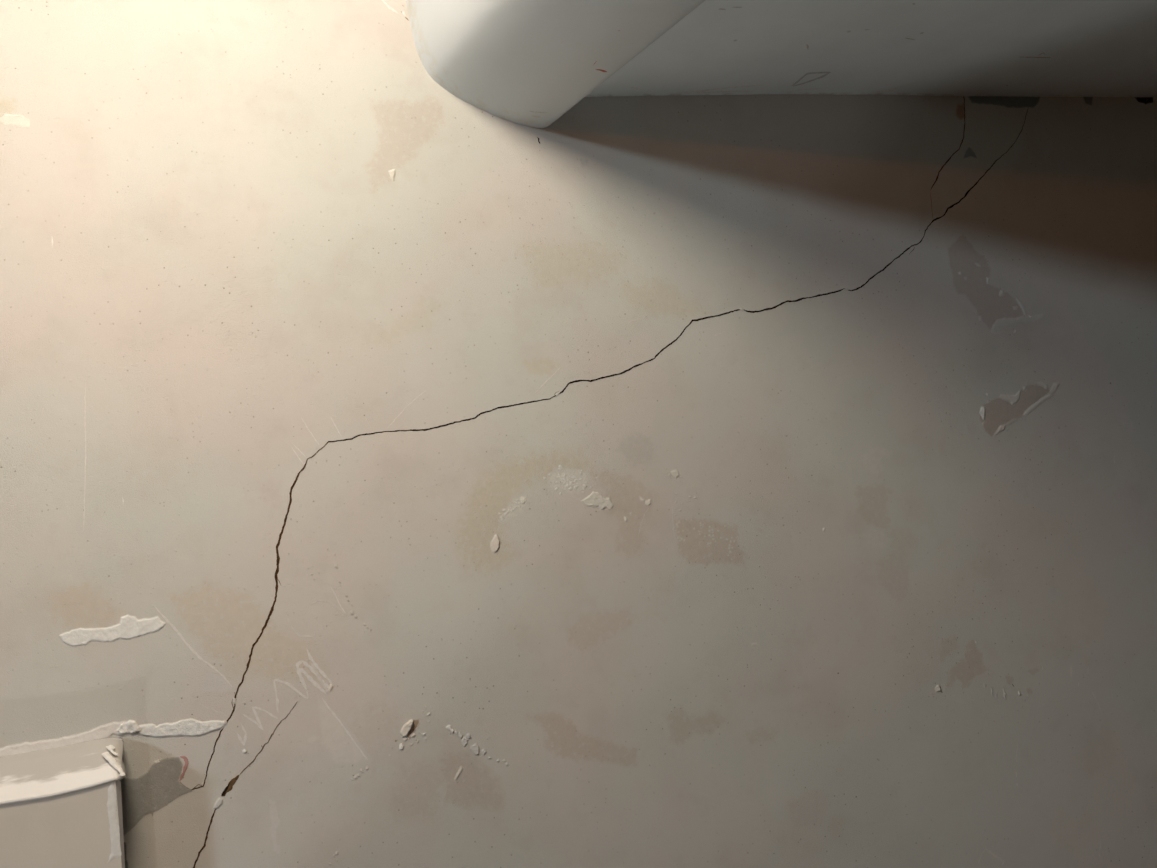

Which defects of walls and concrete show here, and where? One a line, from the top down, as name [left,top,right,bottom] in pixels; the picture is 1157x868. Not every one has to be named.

crack [180,97,1028,868]
peeling [977,380,1060,440]